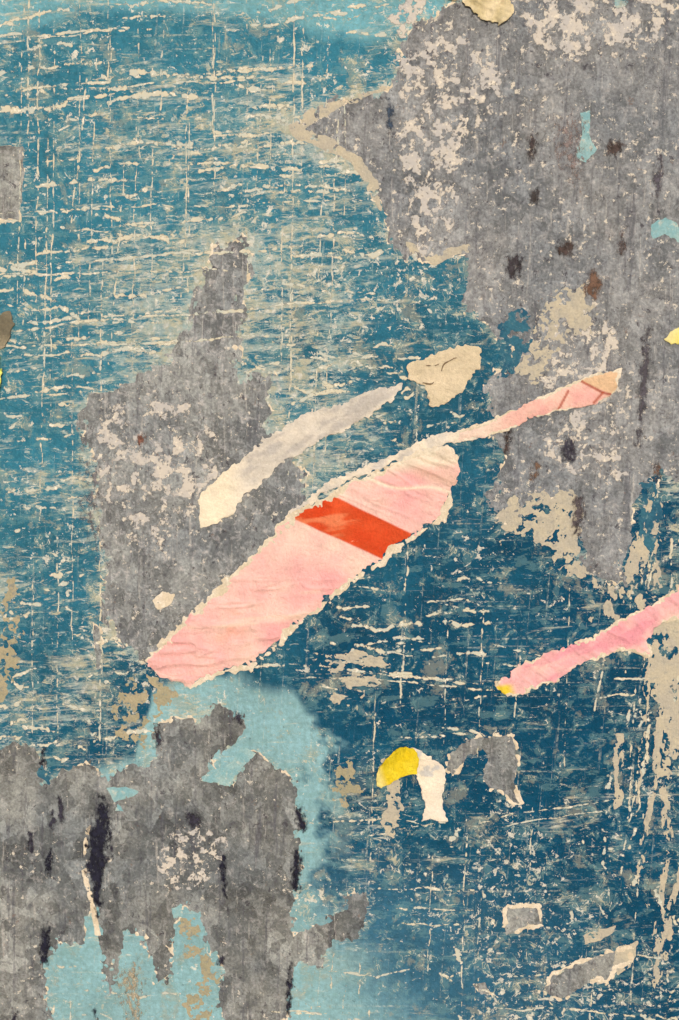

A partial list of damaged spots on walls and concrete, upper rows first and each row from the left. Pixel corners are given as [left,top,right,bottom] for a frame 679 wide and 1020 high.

peeling [0,145,25,222]
peeling [294,0,679,623]
peeling [69,232,310,670]
peeling [0,577,25,639]
peeling [322,670,380,707]
peeling [445,732,524,807]
peeling [0,674,369,1020]
peeling [502,903,543,935]
peeling [538,945,634,1001]